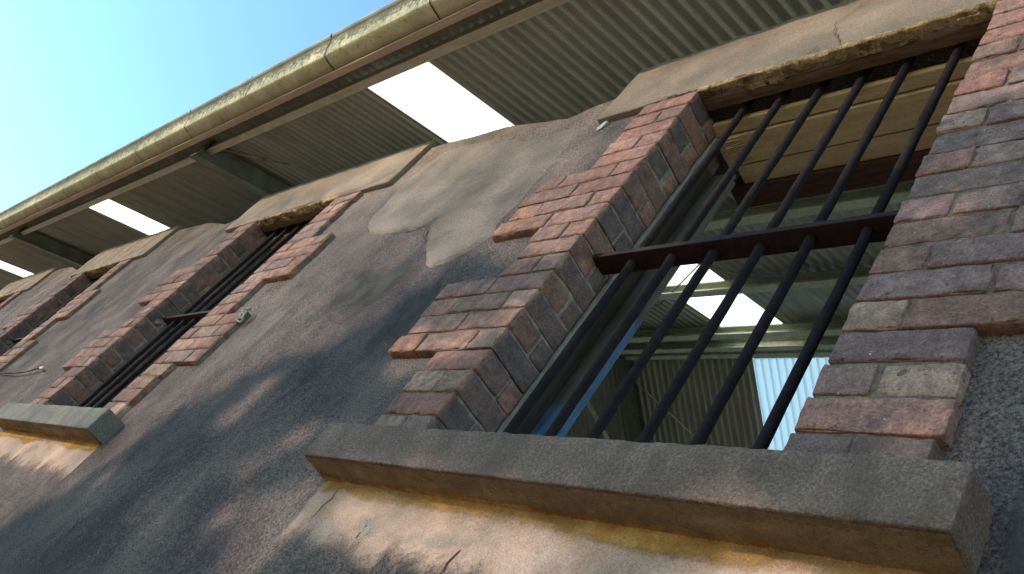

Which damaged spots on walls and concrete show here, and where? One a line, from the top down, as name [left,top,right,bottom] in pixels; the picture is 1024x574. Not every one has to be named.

flaking render [697,0,1001,101]
flaking render [257,195,339,227]